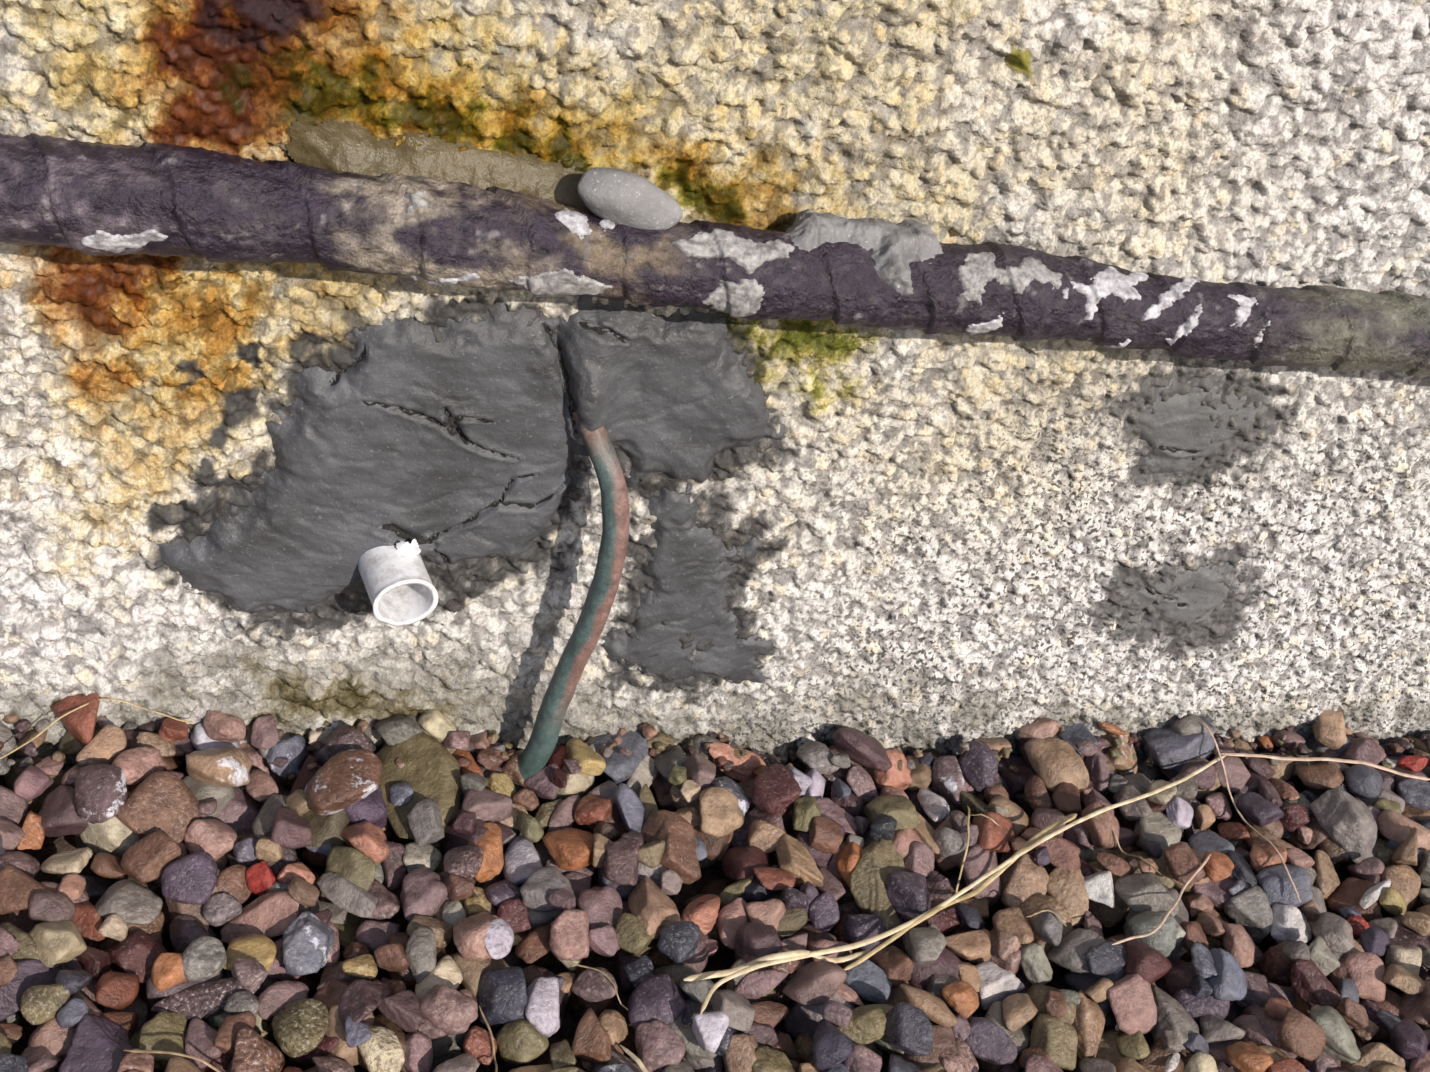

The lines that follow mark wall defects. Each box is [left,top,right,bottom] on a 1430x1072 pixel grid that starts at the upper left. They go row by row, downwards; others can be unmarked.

rust [147,0,327,155]
rust [42,246,176,334]
crack [331,345,554,576]